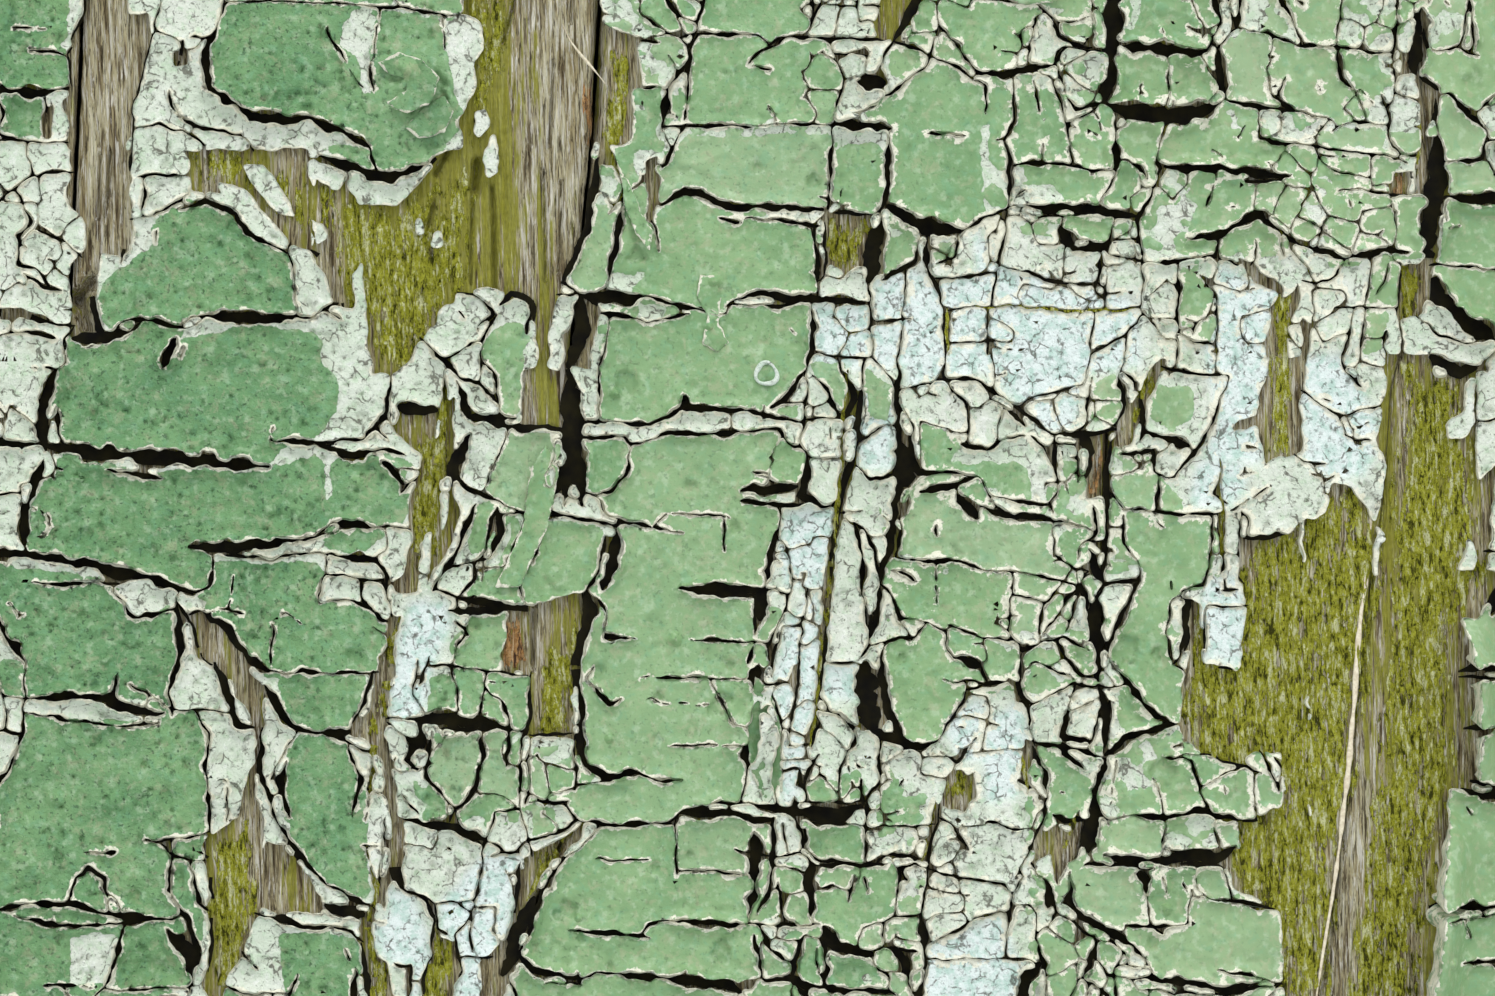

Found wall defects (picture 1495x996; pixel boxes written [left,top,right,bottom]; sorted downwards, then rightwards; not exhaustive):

crack [0,0,86,291]
crack [0,296,411,996]
crack [128,0,454,290]
crack [270,381,438,493]
peeling [0,0,928,996]
peeling [664,0,1495,996]